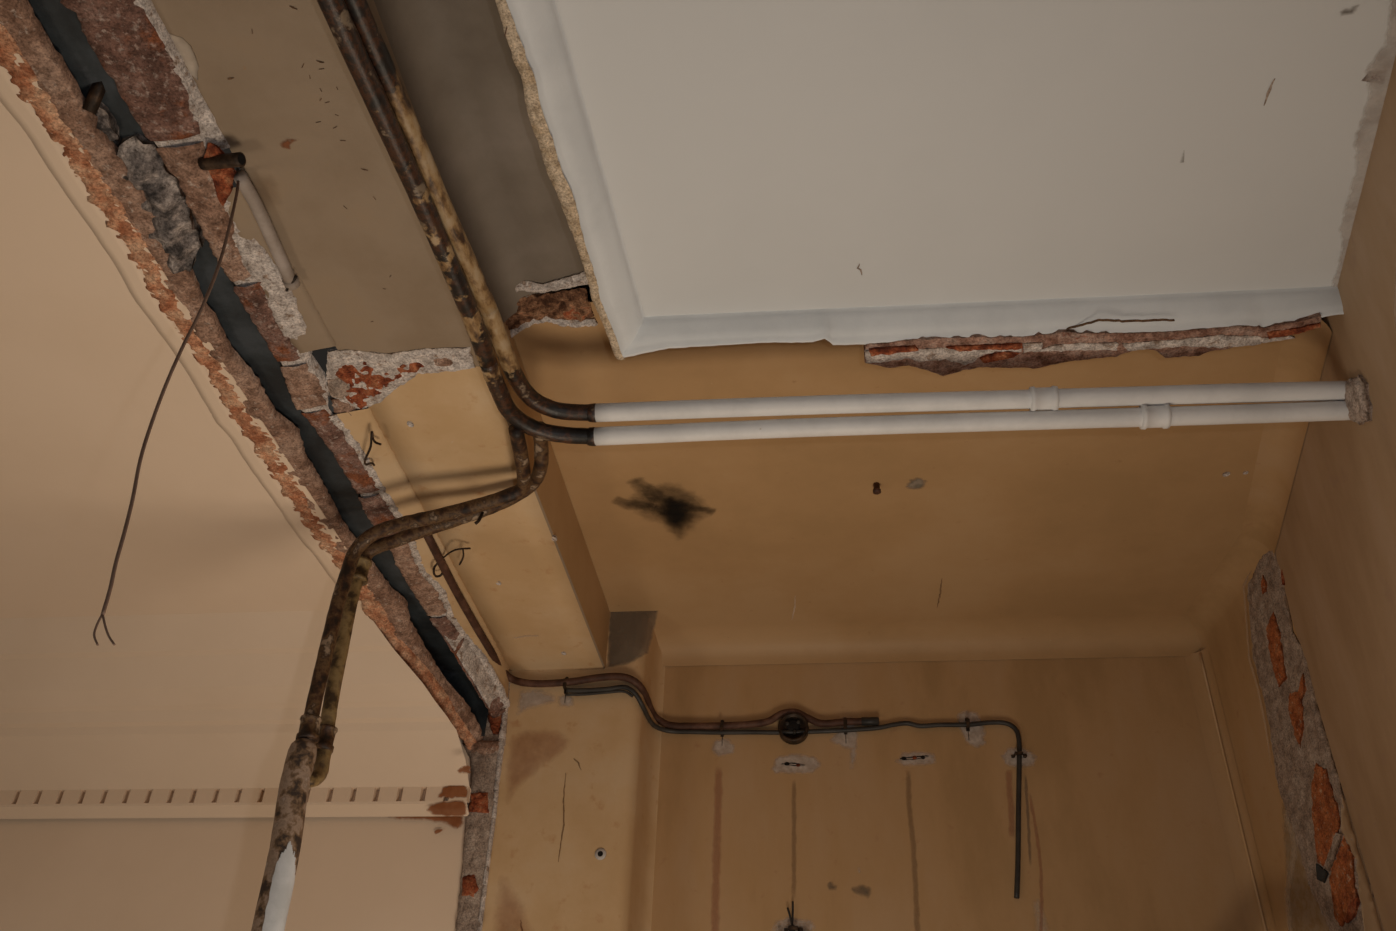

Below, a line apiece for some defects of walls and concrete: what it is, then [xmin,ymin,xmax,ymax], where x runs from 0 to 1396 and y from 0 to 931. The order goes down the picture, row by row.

flaking render [495,0,625,360]
spalling [0,24,345,569]
spalling [335,361,424,410]
spalling [864,312,1321,376]
spalling [358,585,477,750]
flaking render [1266,612,1307,748]
flaking render [1311,763,1356,927]